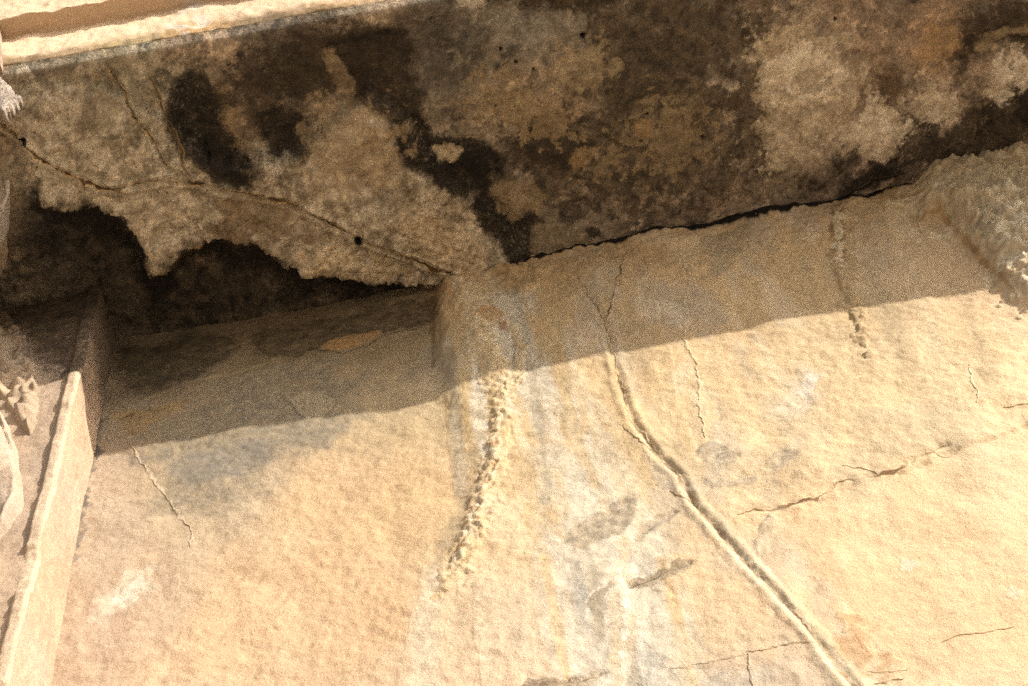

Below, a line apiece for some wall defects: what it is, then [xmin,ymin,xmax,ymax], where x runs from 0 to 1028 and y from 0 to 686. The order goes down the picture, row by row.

crack [4,63,452,275]
water stain [156,0,811,284]
crack [522,162,960,686]
water stain [872,63,909,107]
water stain [765,87,1028,506]
water stain [929,0,1028,89]